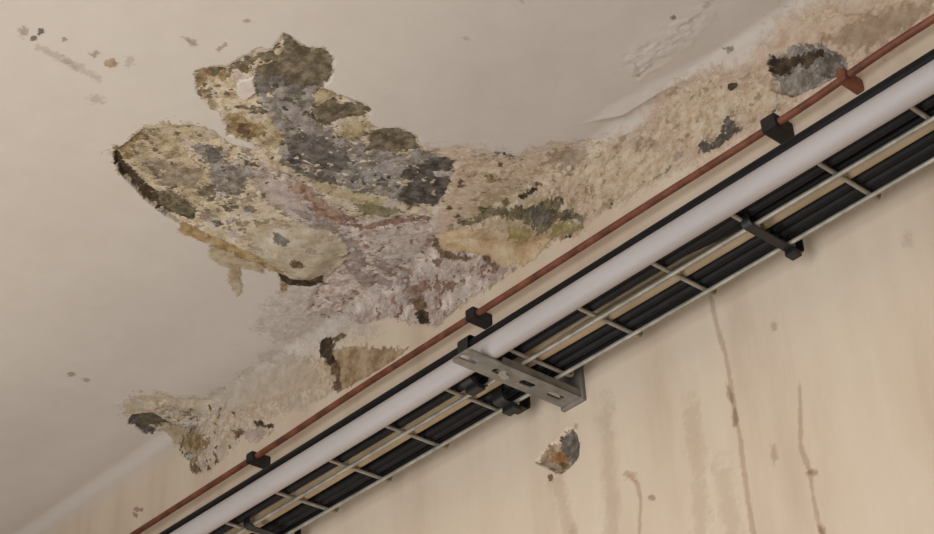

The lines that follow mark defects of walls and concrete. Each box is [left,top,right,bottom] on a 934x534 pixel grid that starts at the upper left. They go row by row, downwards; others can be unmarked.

leakage [647,0,932,165]
spalling [767,43,848,98]
spalling [107,33,516,327]
leakage [437,155,606,244]
flaking render [128,355,336,474]
spalling [539,429,580,481]